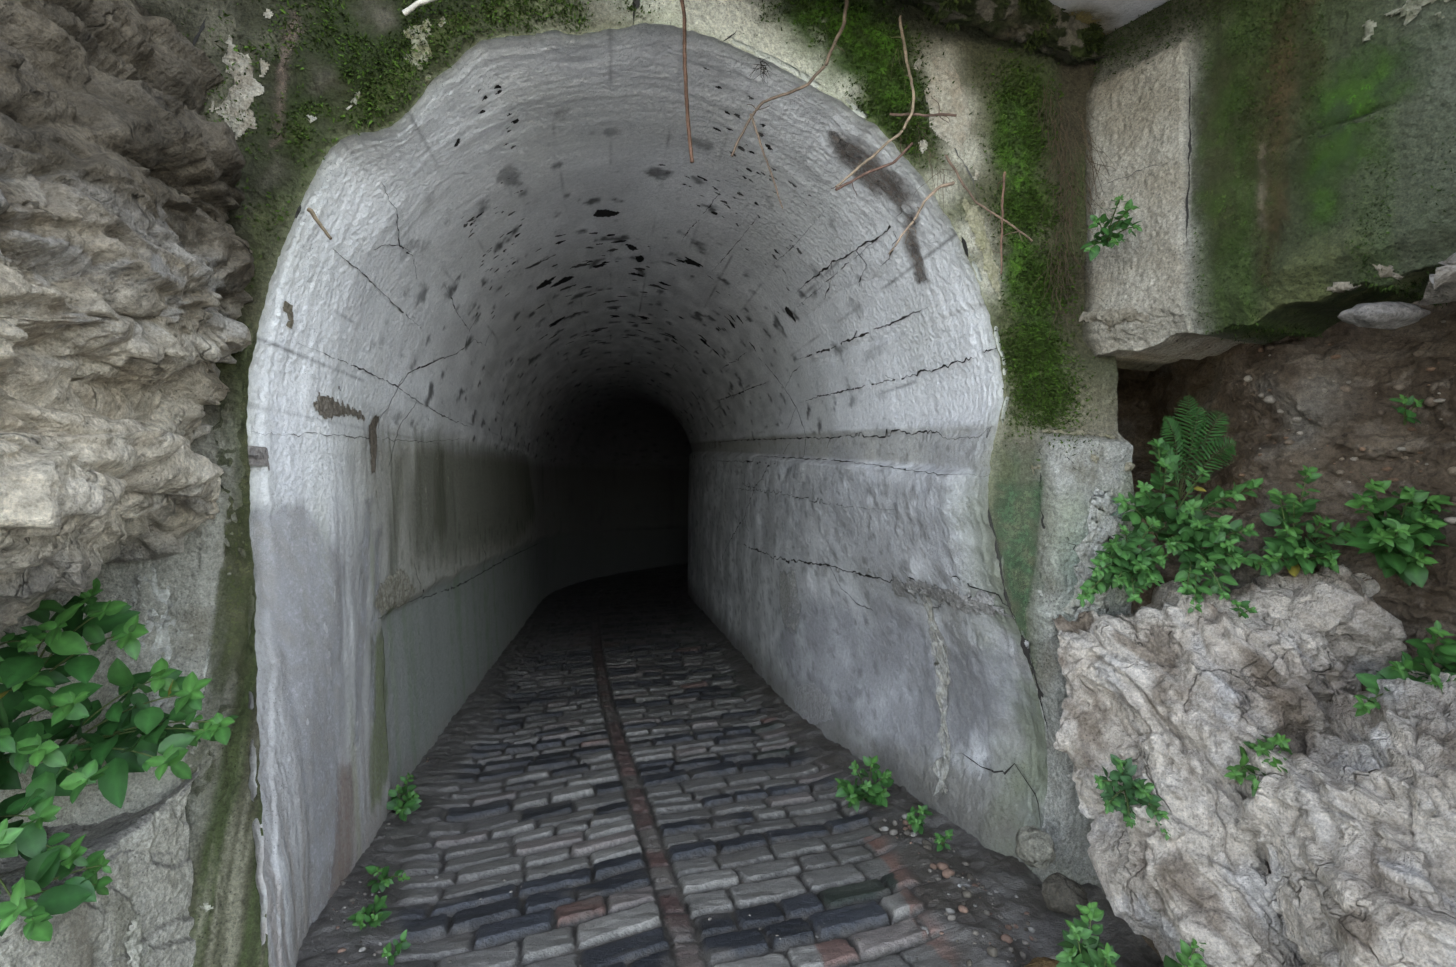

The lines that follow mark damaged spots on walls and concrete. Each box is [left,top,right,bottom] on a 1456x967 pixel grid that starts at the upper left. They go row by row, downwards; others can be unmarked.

peeling [313,386,380,498]
crack [252,183,489,464]
crack [776,211,902,305]
crack [709,308,1048,732]